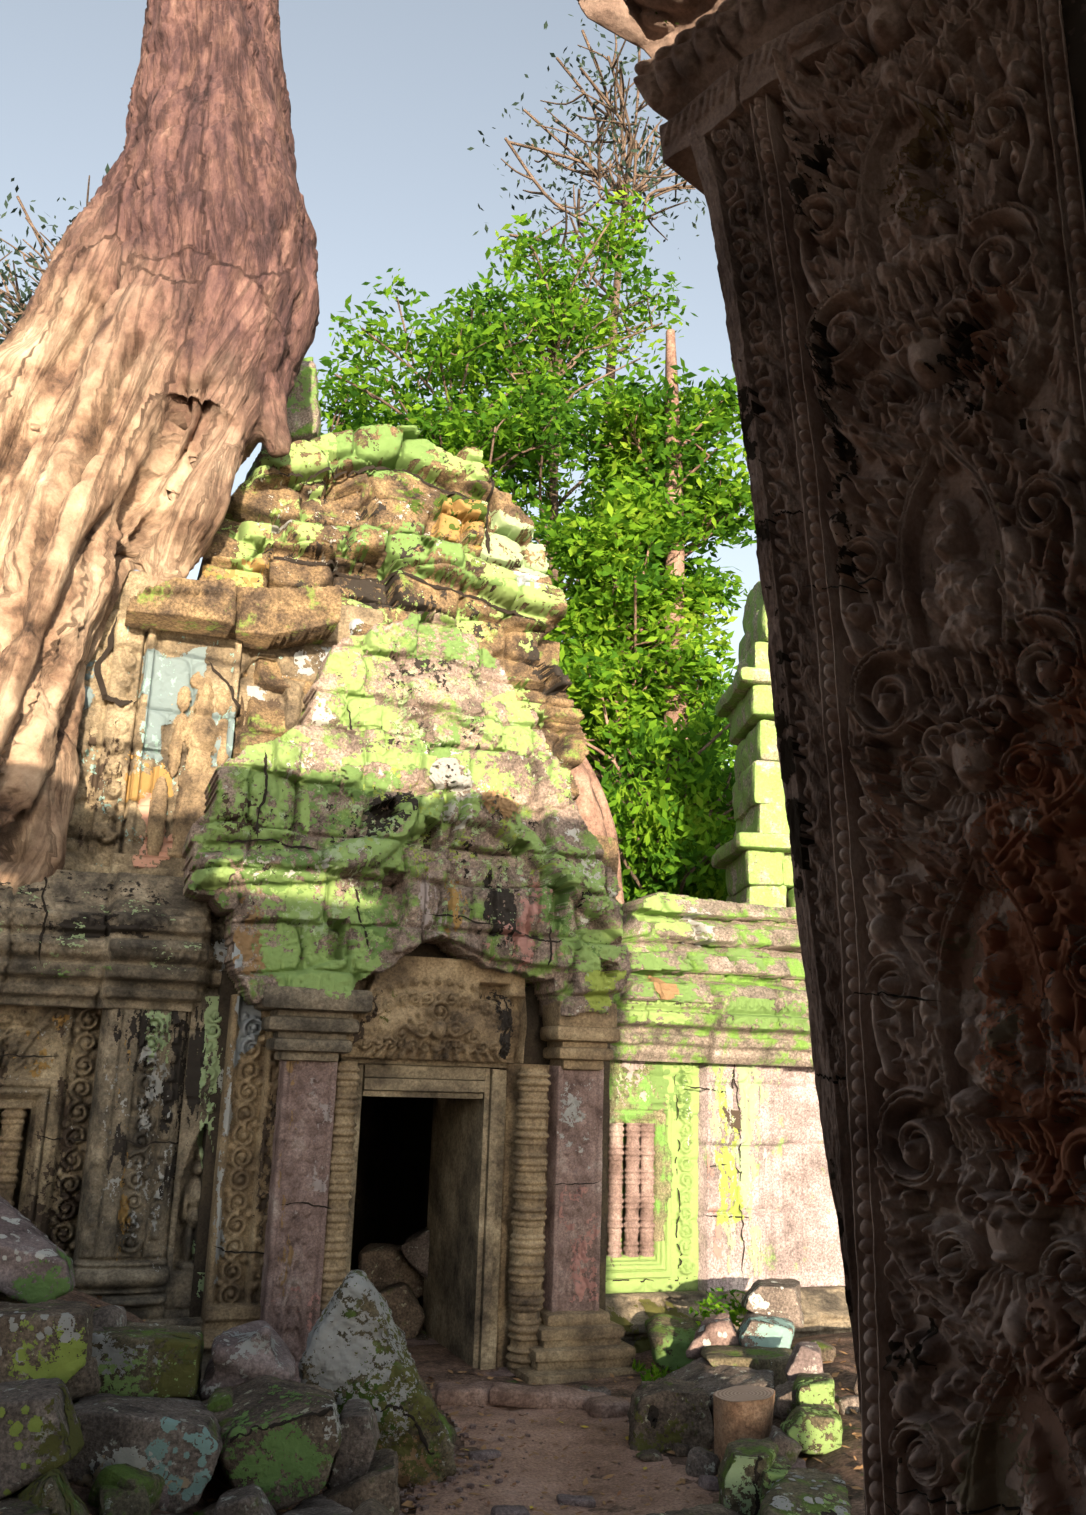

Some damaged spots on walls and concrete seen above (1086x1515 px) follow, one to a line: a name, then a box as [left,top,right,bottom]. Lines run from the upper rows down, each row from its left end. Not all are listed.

damp [737,386,766,475]
damp [755,519,782,541]
spalling [83,656,96,710]
spalling [124,646,207,803]
spalling [210,711,236,767]
spalling [247,686,267,701]
crack [219,752,315,850]
damp [773,650,815,918]
damp [0,1008,96,1249]
damp [107,996,208,1261]
damp [722,1106,745,1134]
damp [830,1159,853,1316]